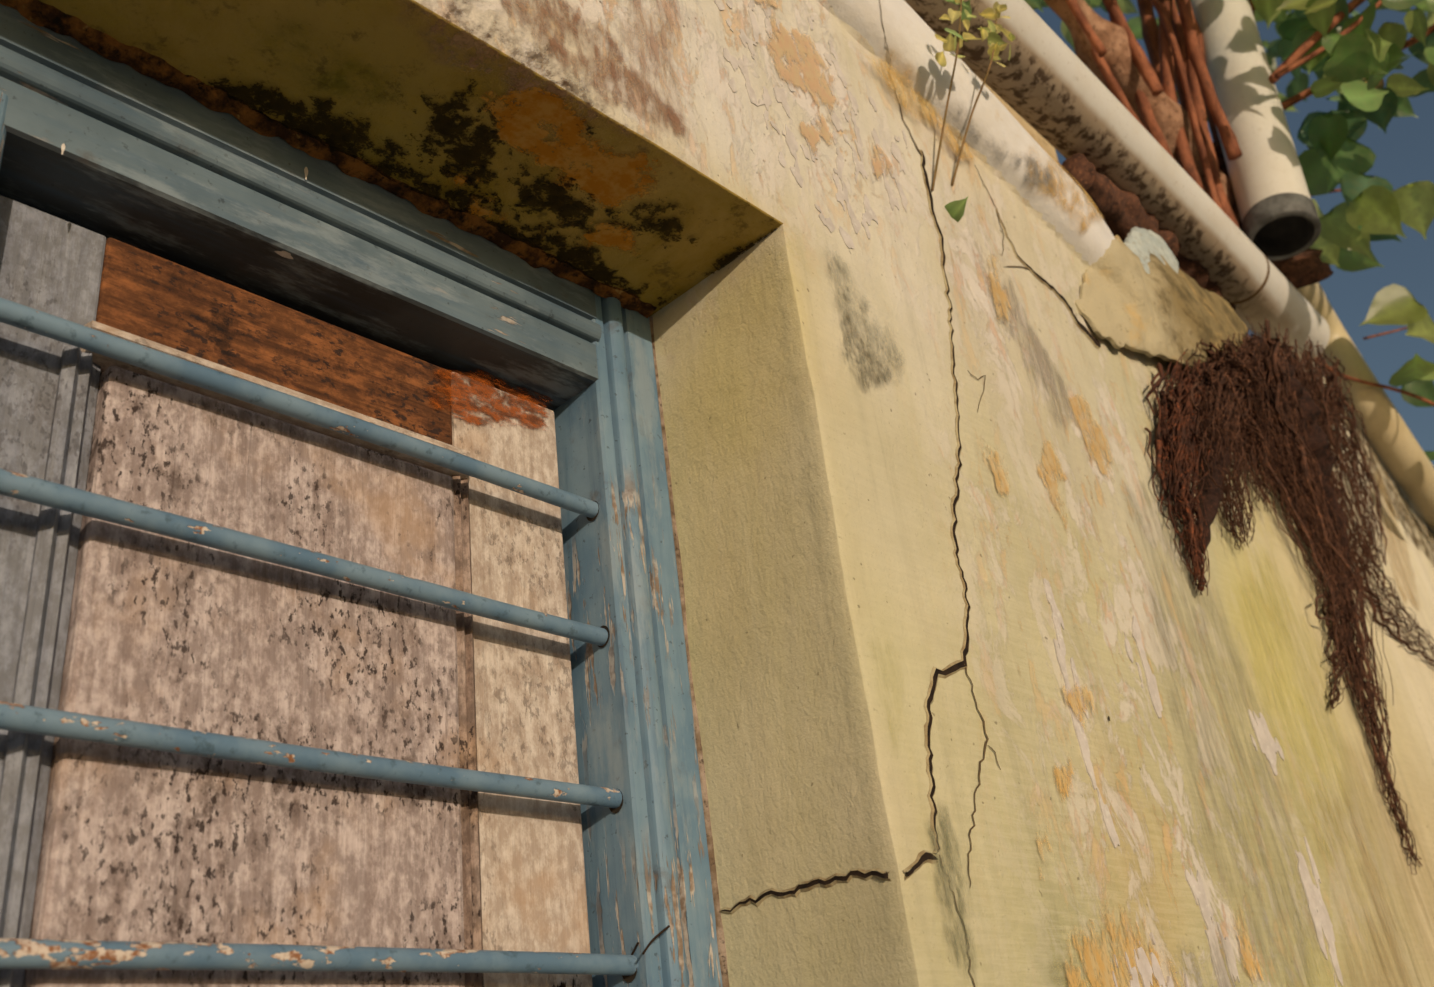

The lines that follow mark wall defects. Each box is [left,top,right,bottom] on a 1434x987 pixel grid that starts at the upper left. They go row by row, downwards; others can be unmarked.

leakage [199,0,696,306]
peeling [713,0,908,249]
leakage [705,230,776,276]
crack [975,166,1101,348]
crack [649,0,1001,987]
peeling [1042,578,1120,848]
peeling [1123,615,1163,718]
peeling [1247,709,1284,776]
peeling [1065,905,1190,987]
peeling [1185,868,1264,987]
peeling [1295,837,1343,987]